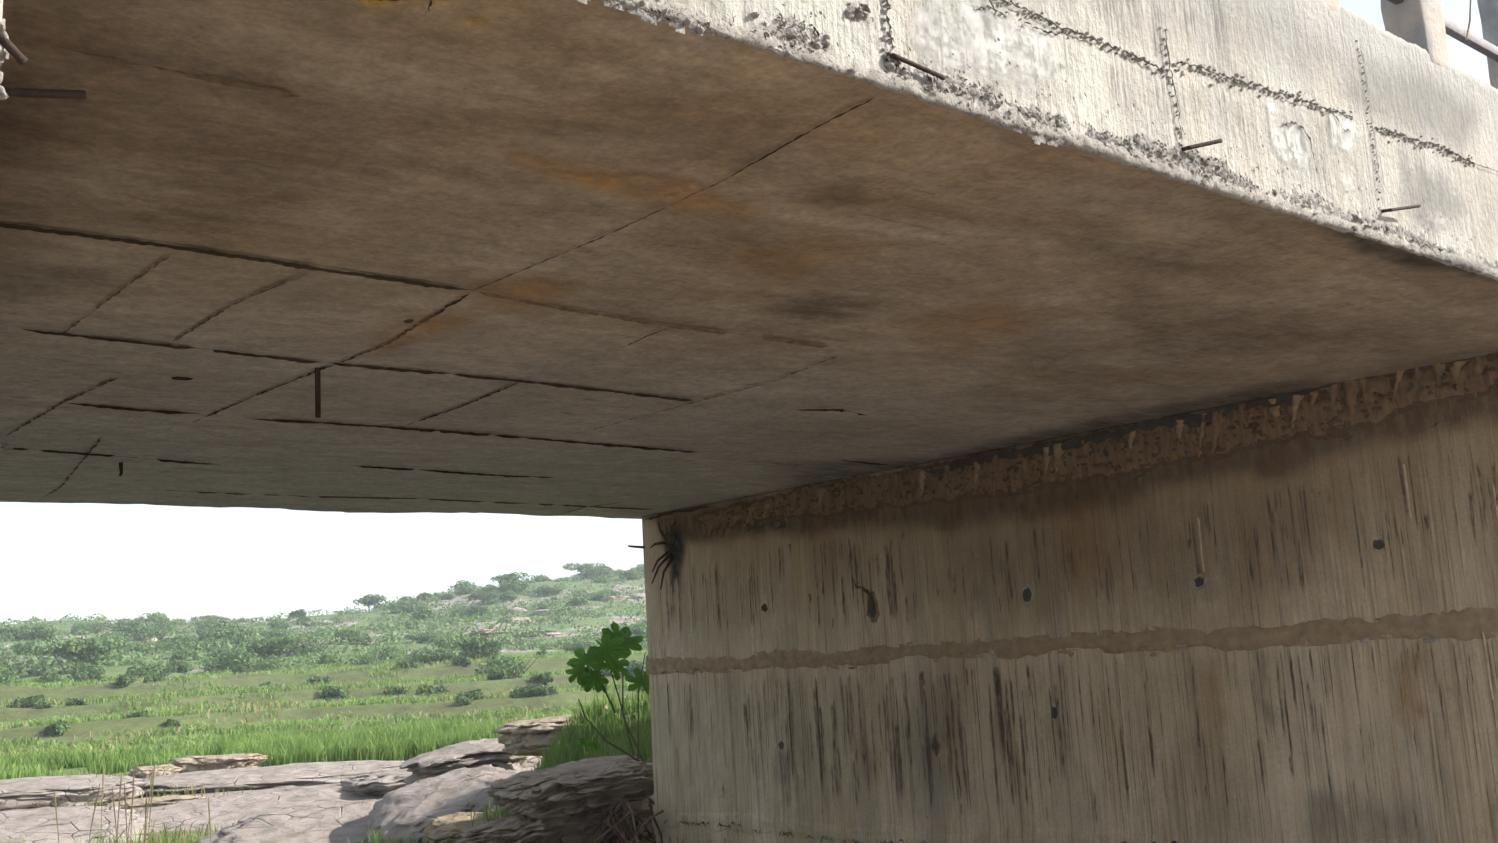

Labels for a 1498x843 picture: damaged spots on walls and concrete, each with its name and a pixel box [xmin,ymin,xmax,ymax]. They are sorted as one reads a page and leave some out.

spalling [577,0,1498,281]
crack [945,0,1497,174]
damp [667,665,1167,819]
damp [1233,652,1333,790]